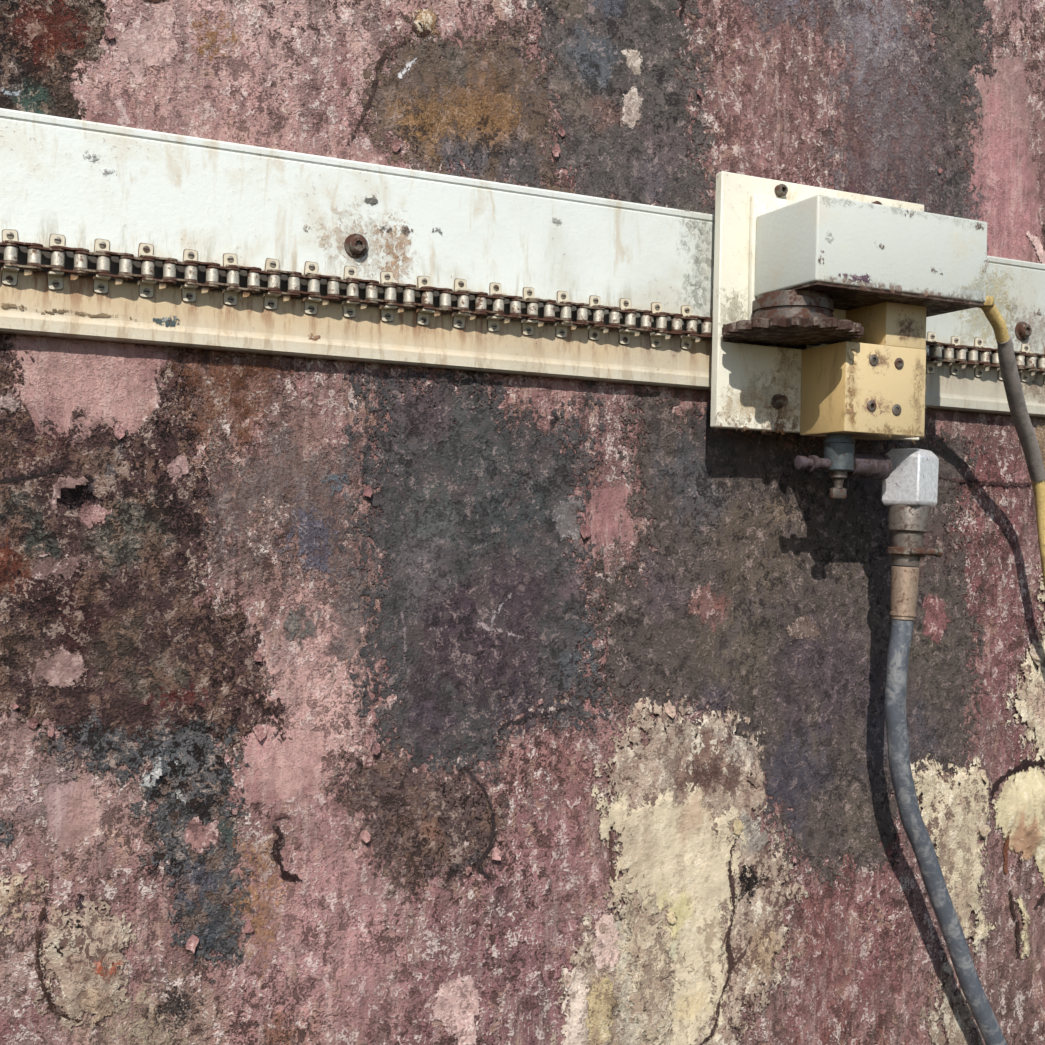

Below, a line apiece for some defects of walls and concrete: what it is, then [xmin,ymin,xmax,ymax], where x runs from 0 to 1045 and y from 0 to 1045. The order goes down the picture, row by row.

corrosion [387,85,522,153]
water stain [552,496,584,541]
peeling [324,362,994,904]
peeling [0,333,293,1039]
crack [270,813,302,882]
crack [607,831,616,882]
peeling [593,908,623,969]
crack [700,838,753,1045]